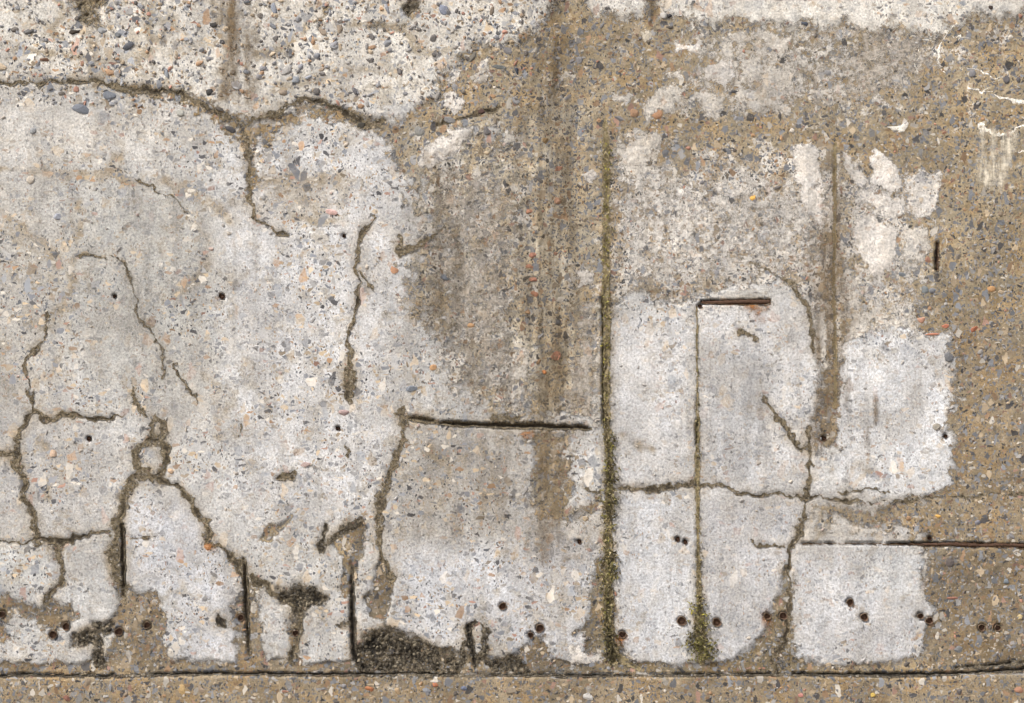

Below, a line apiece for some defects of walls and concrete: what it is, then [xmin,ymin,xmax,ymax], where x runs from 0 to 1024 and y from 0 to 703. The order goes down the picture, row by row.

crack [0,77,386,237]
crack [435,105,502,126]
crack [75,253,198,402]
crack [343,215,377,405]
leakage [538,308,567,409]
spalling [348,0,1024,676]
corrosion [701,299,771,313]
crack [0,307,304,667]
crack [373,406,410,585]
crack [584,395,1024,675]
spalling [0,582,362,675]